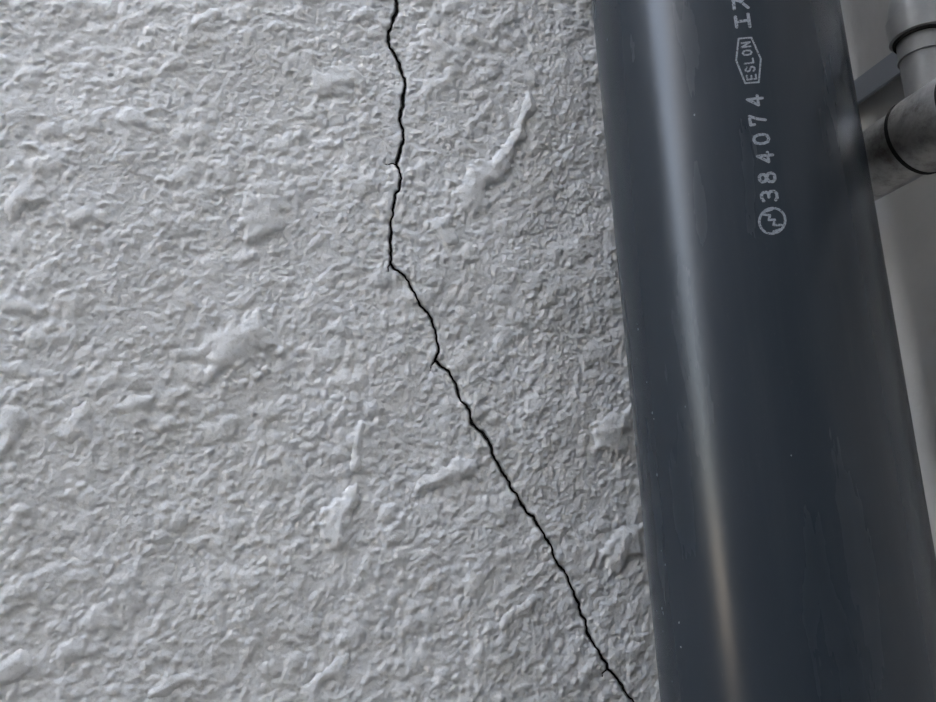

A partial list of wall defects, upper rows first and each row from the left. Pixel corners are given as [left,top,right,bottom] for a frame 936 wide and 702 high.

crack [385,0,634,702]